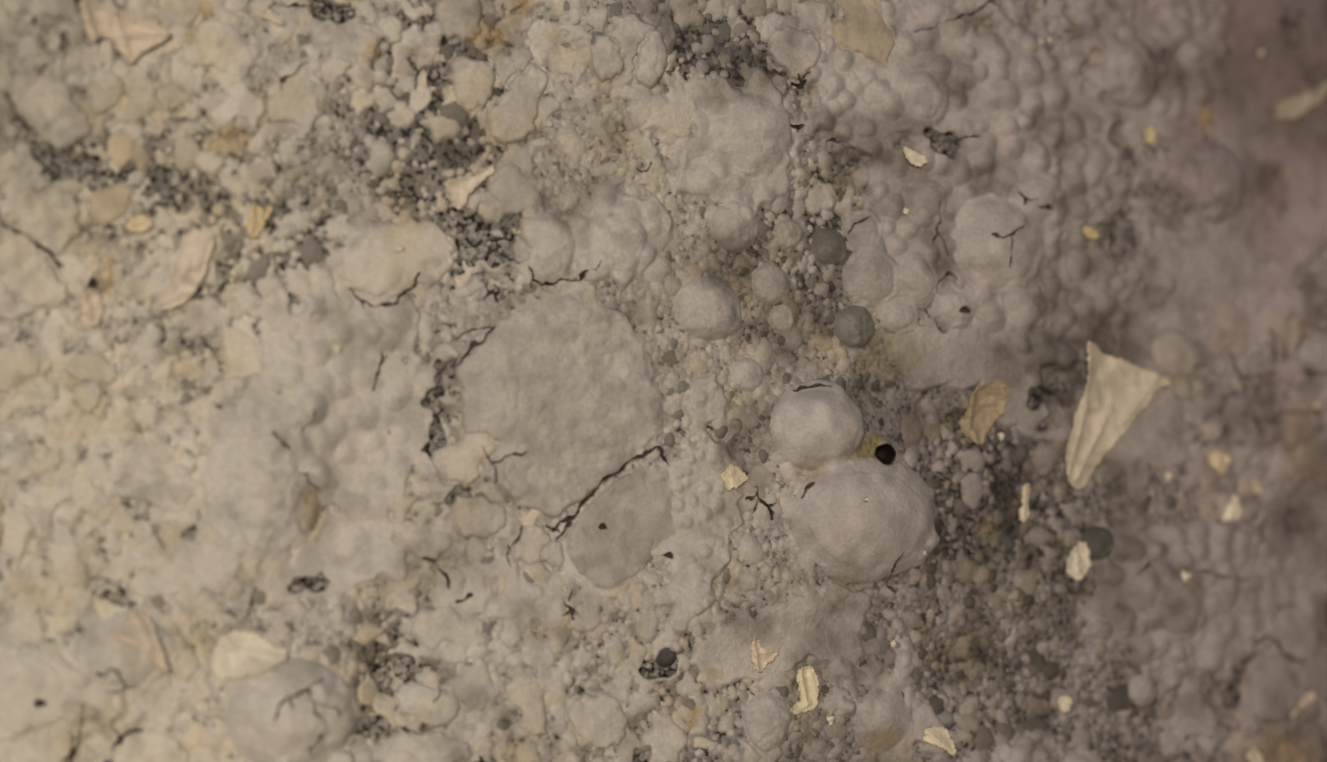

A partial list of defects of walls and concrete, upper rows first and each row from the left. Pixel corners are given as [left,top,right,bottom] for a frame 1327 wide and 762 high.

spalling [59,31,70,55]
peeling [79,0,171,63]
spalling [1027,384,1060,410]
peeling [1065,341,1172,490]
crack [506,446,669,566]